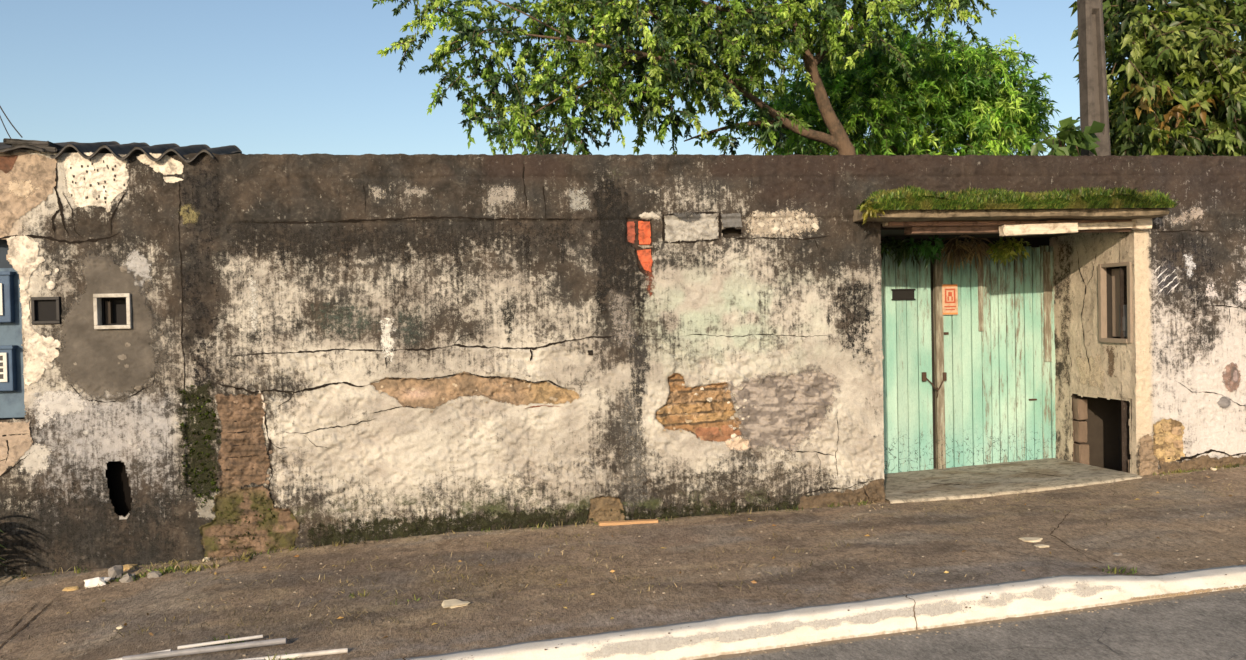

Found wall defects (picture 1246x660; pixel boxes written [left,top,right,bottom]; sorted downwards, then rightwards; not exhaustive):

crack [0,163,124,244]
crack [230,167,593,224]
flaking render [0,138,184,477]
crack [68,158,186,415]
water stain [178,158,843,509]
water stain [827,280,877,372]
water stain [1155,207,1221,318]
water stain [1236,281,1246,303]
flaking render [368,371,580,413]
crack [216,319,827,508]
flaking render [656,365,840,452]
flaking render [1139,418,1246,476]